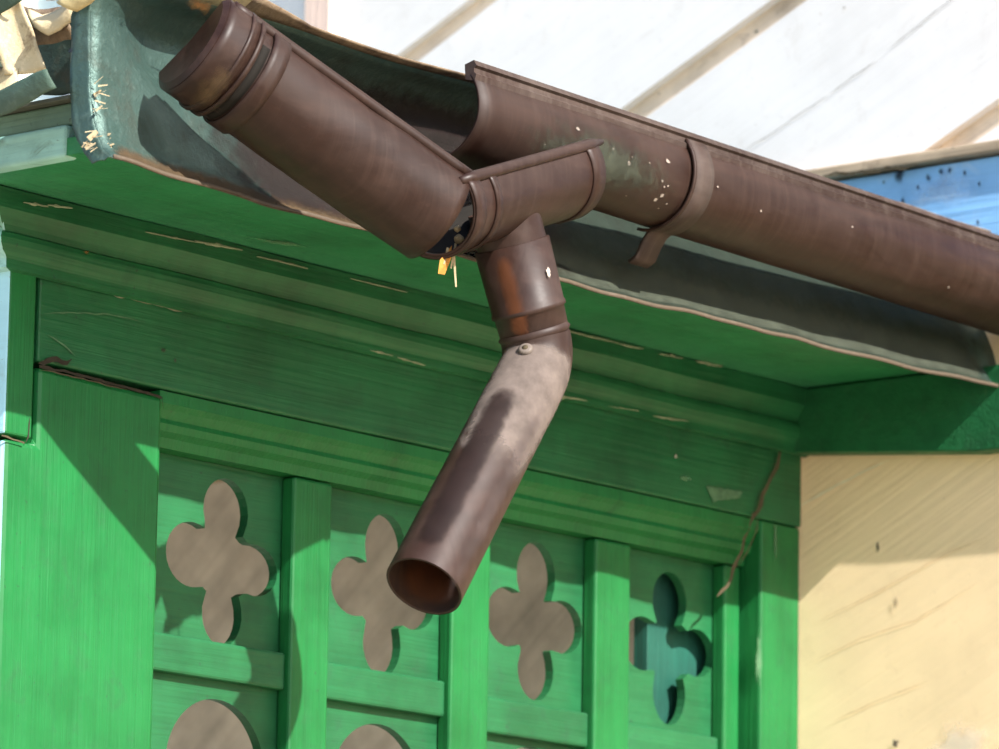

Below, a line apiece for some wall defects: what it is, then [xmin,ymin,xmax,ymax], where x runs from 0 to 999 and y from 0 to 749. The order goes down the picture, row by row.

peeling [147,232,243,251]
crack [38,296,187,402]
peeling [570,331,644,349]
peeling [706,486,743,502]
crack [717,451,781,597]